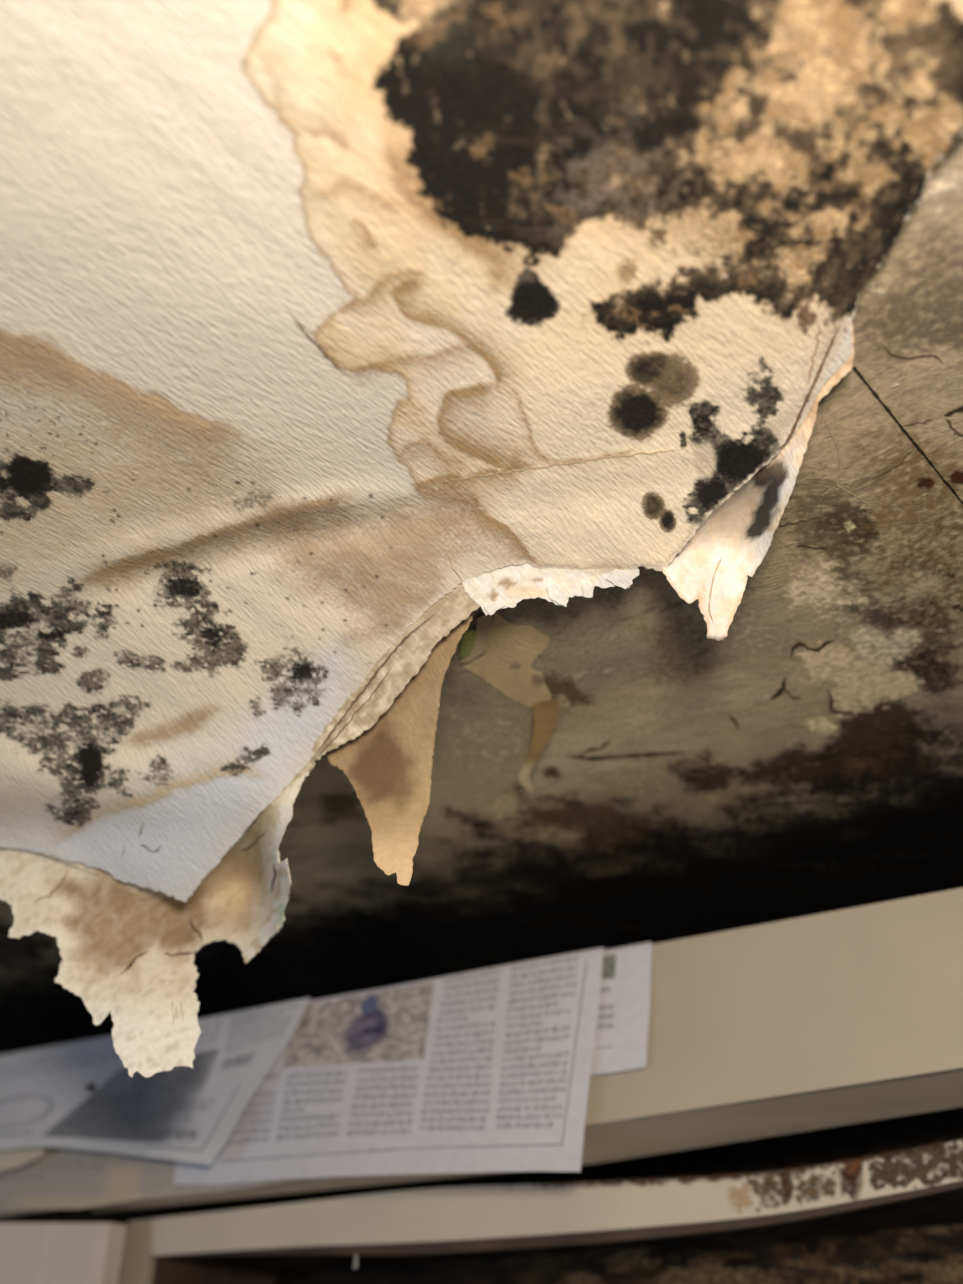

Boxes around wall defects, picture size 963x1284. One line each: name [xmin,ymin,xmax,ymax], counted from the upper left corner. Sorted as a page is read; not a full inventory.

damp [0,0,963,833]
peeling [662,319,855,642]
crack [852,365,963,504]
crack [882,345,942,362]
peeling [546,583,567,607]
peeling [581,569,633,598]
peeling [784,554,924,735]
peeling [459,601,585,850]
peeling [0,899,14,919]
rust [542,1138,963,1212]